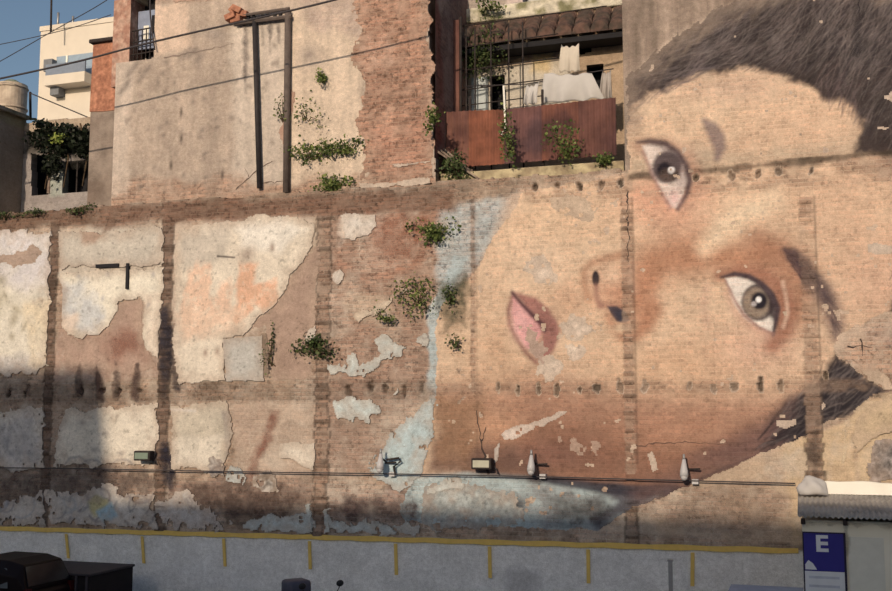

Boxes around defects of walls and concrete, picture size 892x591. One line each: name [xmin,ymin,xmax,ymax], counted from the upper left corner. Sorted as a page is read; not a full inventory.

spalling [224,4,249,23]
flaking render [350,0,437,188]
peeling [332,269,344,285]
peeling [0,214,321,385]
damp [159,307,179,390]
peeling [327,334,406,377]
damp [95,363,139,401]
flaking render [862,369,892,390]
damp [160,444,174,488]
peeling [0,396,525,538]
flaking render [866,439,892,483]